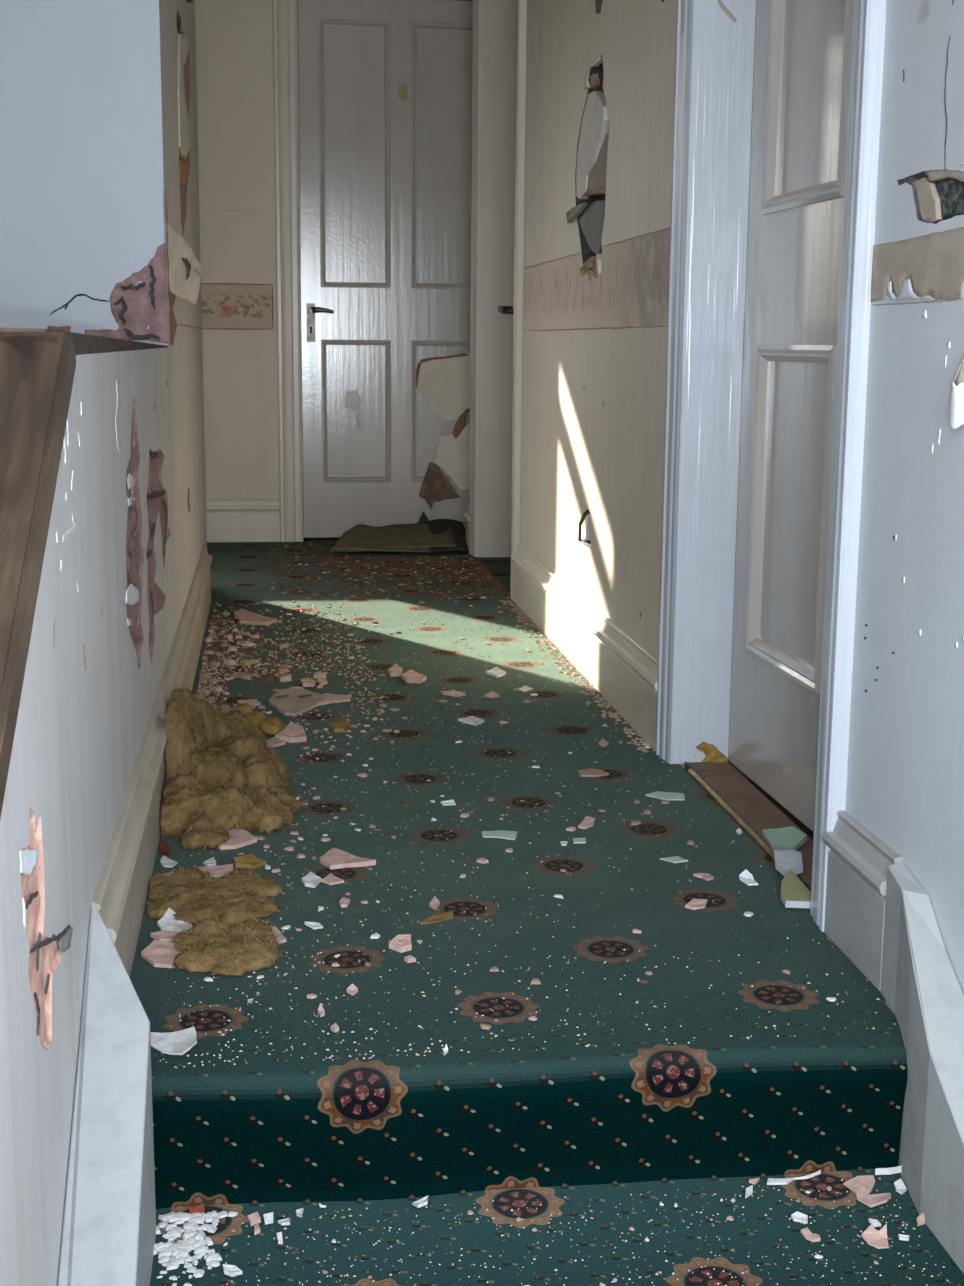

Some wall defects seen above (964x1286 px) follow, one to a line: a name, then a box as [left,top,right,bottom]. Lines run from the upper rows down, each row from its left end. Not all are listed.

flaking render [47,190,177,346]
spalling [566,56,610,280]
peeling [871,161,964,318]
crack [943,36,951,171]
flaking render [125,397,171,669]
flaking render [20,806,73,1051]